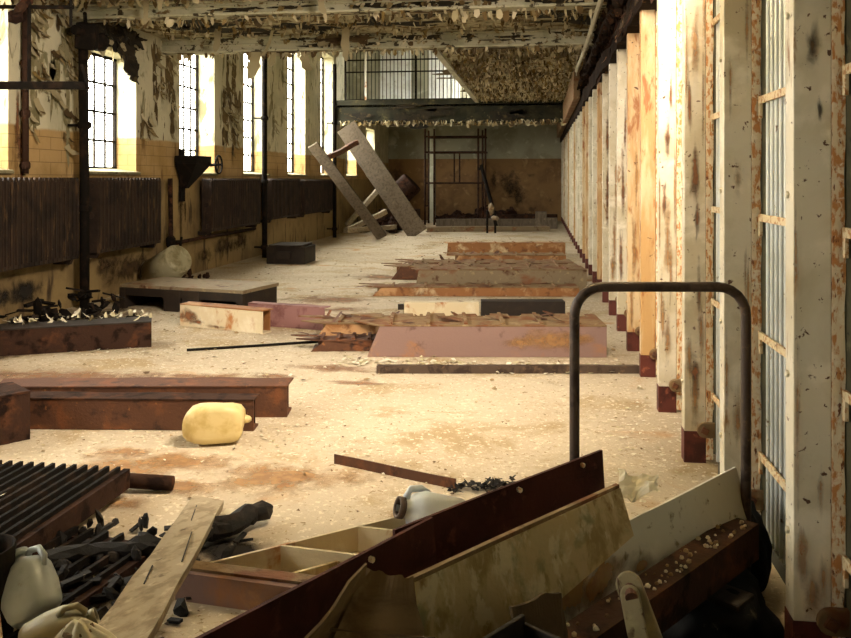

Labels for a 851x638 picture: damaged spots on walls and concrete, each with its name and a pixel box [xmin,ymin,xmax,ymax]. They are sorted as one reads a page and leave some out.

peeling [29,0,607,168]